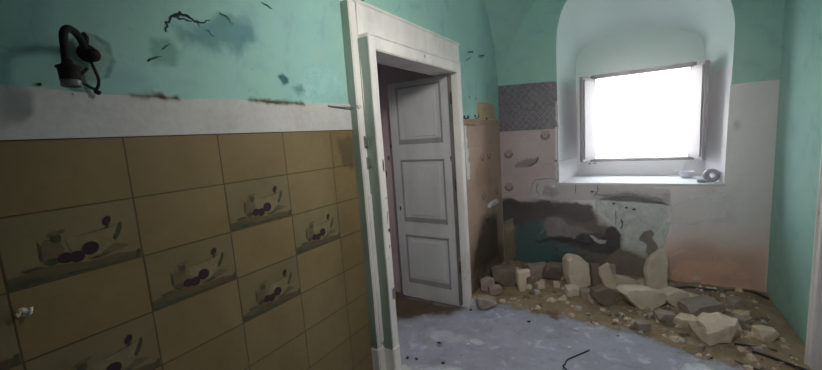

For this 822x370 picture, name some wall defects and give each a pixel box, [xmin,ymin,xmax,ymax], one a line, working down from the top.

crack [148,11,233,62]
peeling [529,178,672,259]